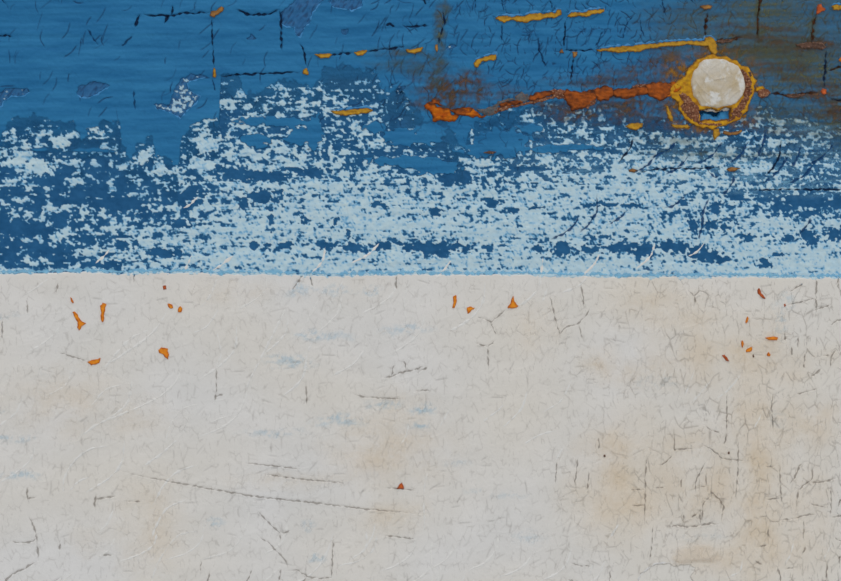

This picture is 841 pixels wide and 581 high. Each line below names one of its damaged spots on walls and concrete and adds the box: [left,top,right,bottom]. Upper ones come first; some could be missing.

crack [123,7,306,90]
peeling [279,0,364,38]
crack [386,13,446,42]
peeling [495,7,605,23]
crack [563,26,602,77]
crack [704,0,762,40]
crack [773,18,841,101]
peeling [816,2,841,14]
corrosion [424,52,688,122]
peeling [0,35,841,280]